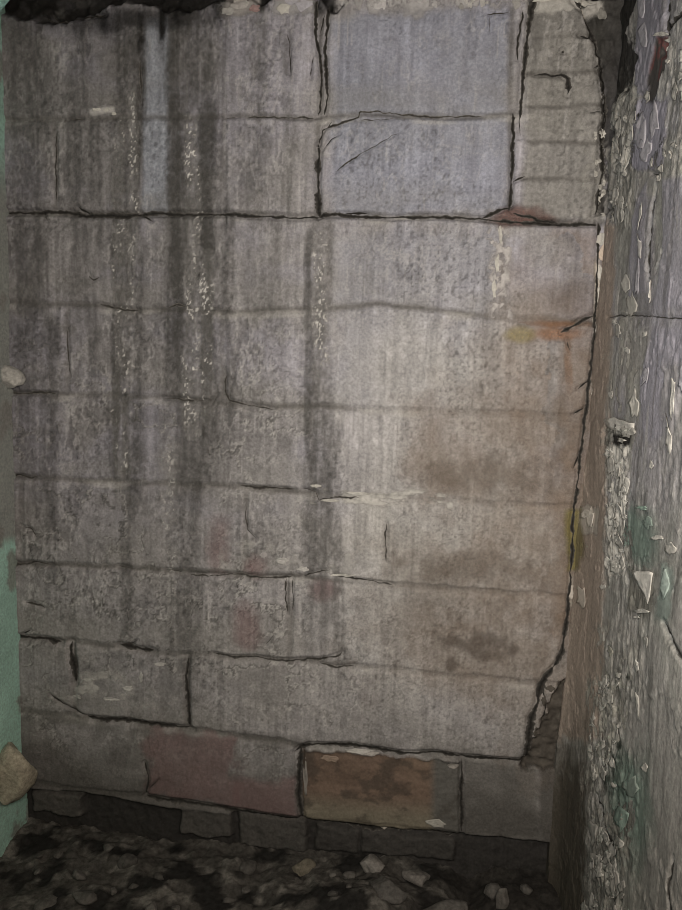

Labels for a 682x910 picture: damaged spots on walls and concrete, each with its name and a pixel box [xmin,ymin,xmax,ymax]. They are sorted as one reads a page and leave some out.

leakage [111,354,139,467]
leakage [112,40,141,293]
leakage [169,43,214,431]
crack [9,0,601,836]
leakage [305,252,337,357]
leakage [566,510,583,570]
peeling [569,577,585,609]
crack [575,2,609,214]
peeling [578,0,682,620]
peeling [580,625,648,910]